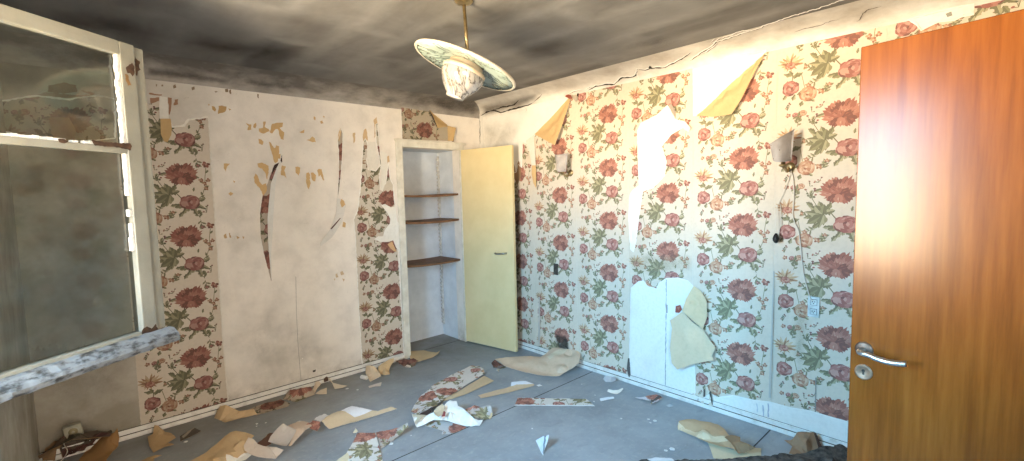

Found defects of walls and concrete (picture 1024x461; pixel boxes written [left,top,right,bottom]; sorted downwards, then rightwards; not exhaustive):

crack [479,0,881,121]
peeling [246,122,324,196]
peeling [338,117,378,143]
peeling [483,93,579,185]
peeling [629,50,766,252]
peeling [627,277,848,442]